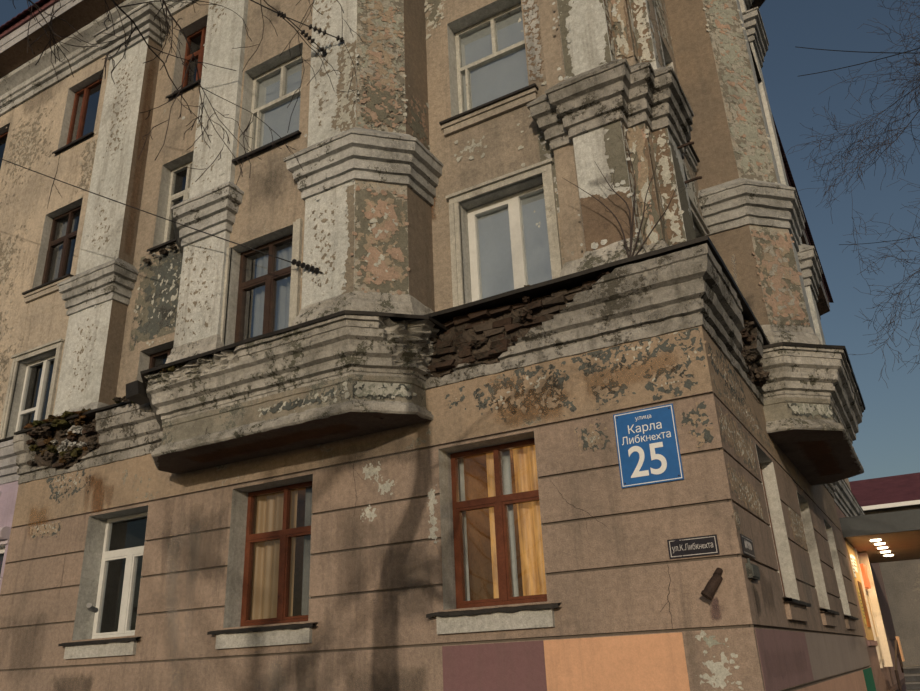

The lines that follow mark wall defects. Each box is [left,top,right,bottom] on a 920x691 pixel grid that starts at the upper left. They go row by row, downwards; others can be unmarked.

peeling [518,0,546,85]
peeling [552,0,575,81]
peeling [703,0,778,183]
peeling [301,180,410,295]
spalling [424,269,612,378]
flaking render [578,121,701,251]
peeling [751,229,810,327]
spalling [26,418,101,541]
peeling [258,381,417,417]
peeling [427,484,438,544]
peeling [444,319,774,535]
peeling [695,628,743,690]